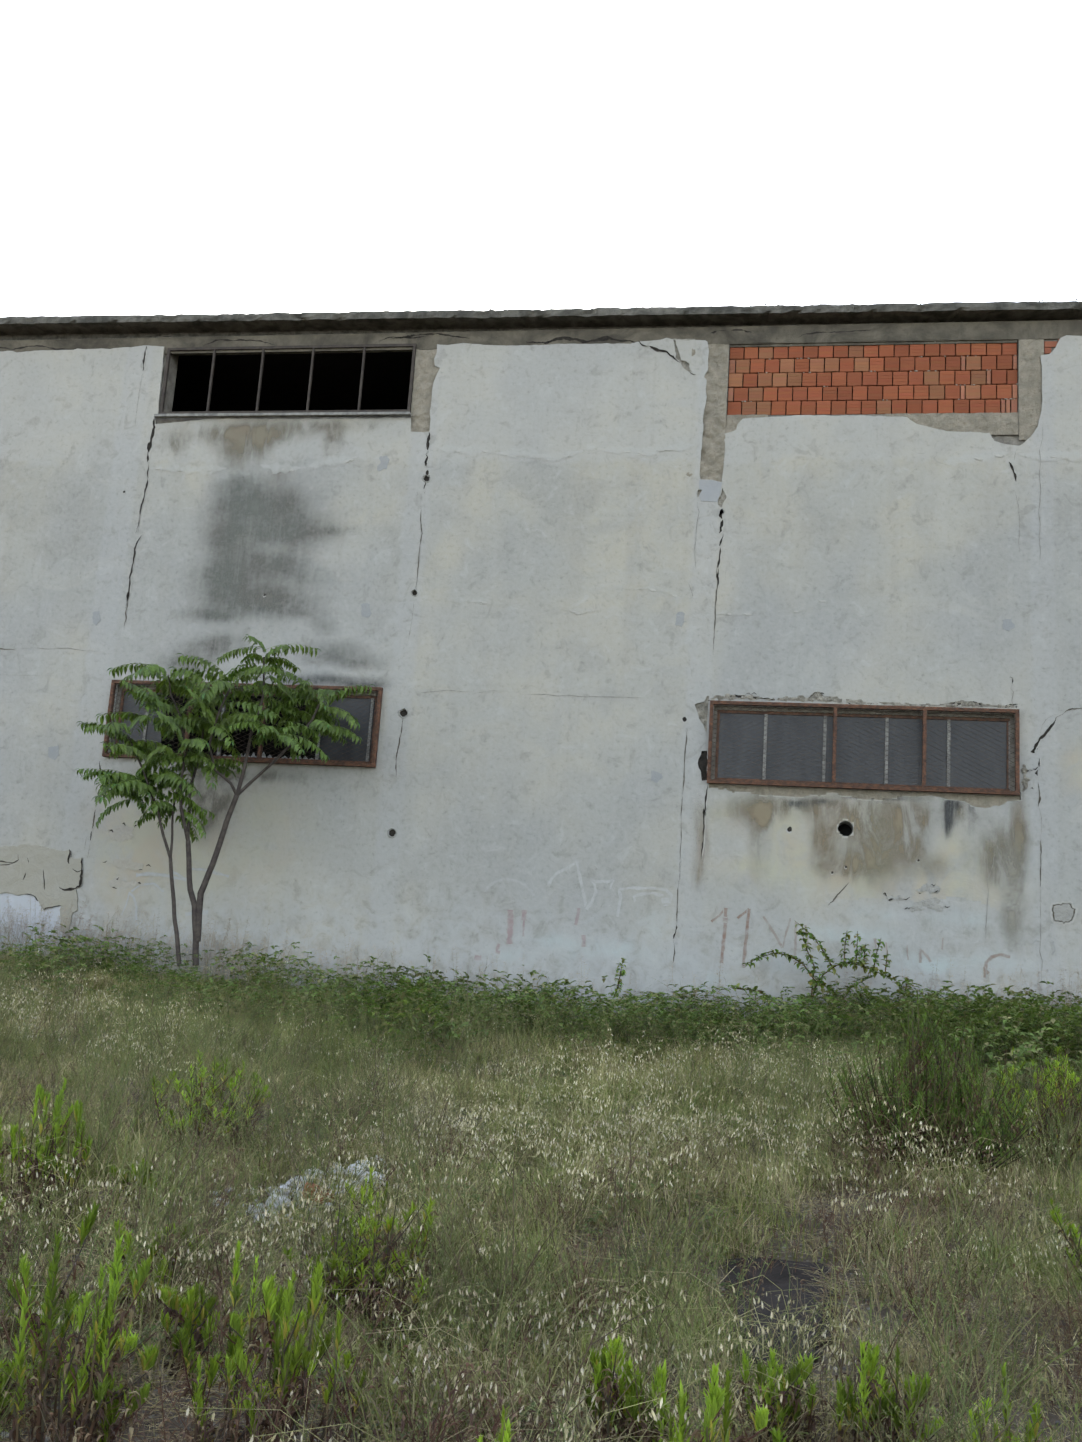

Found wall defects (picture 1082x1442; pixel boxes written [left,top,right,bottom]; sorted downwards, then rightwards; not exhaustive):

crack [0,345,156,625]
damp [211,423,300,457]
spalling [673,331,811,508]
spalling [885,339,1059,440]
crack [689,502,725,649]
peeling [0,844,83,951]
damp [470,788,1068,1005]
crack [957,677,1082,989]